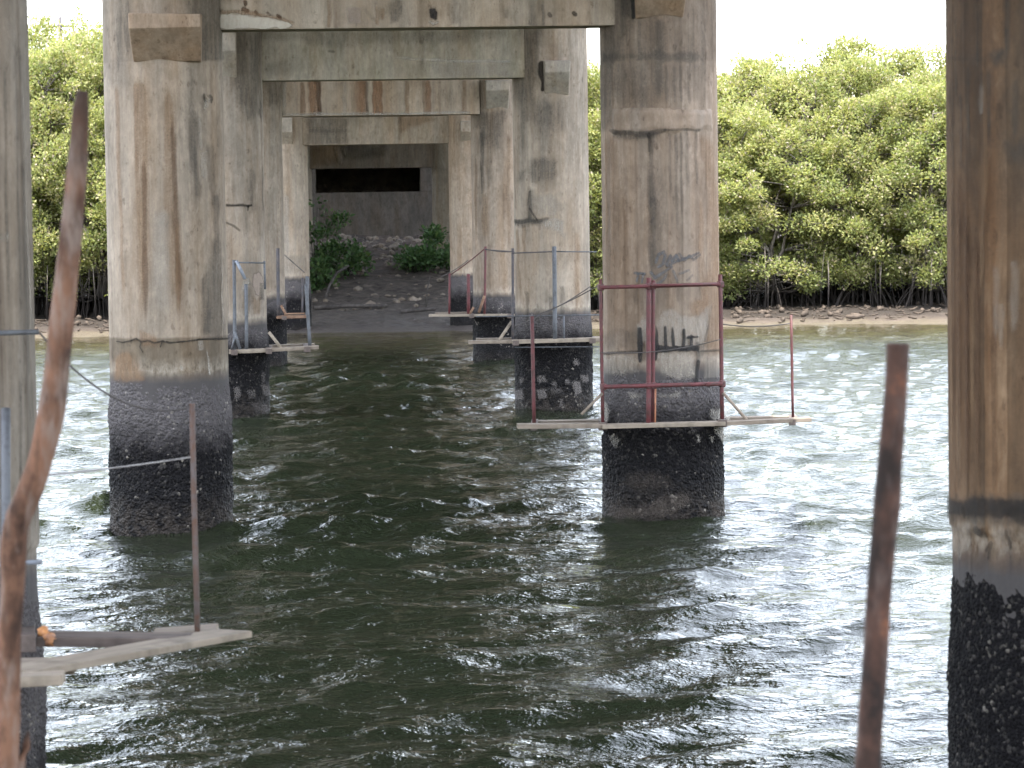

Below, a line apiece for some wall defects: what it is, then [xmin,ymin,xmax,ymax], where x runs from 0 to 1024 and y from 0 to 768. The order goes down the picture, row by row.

corrosion [309,81,321,116]
corrosion [359,81,382,115]
crack [116,337,230,352]